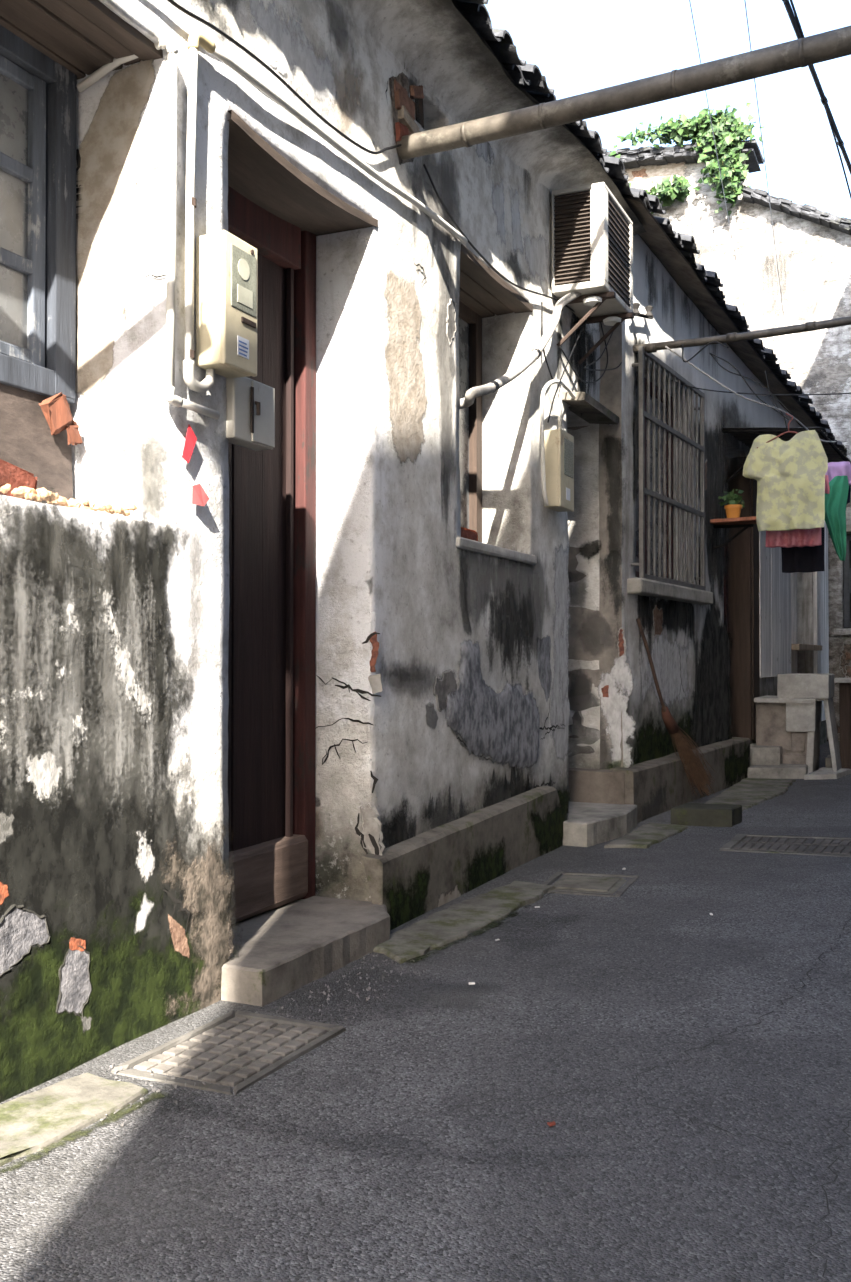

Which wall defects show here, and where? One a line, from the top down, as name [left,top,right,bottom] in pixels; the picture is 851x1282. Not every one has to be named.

leakage [198,0,237,40]
spalling [389,72,424,165]
peeling [75,59,155,401]
leakage [0,424,219,1026]
crack [315,675,381,793]
peeling [598,605,689,768]
spalling [0,882,51,977]
spalling [56,937,92,1031]